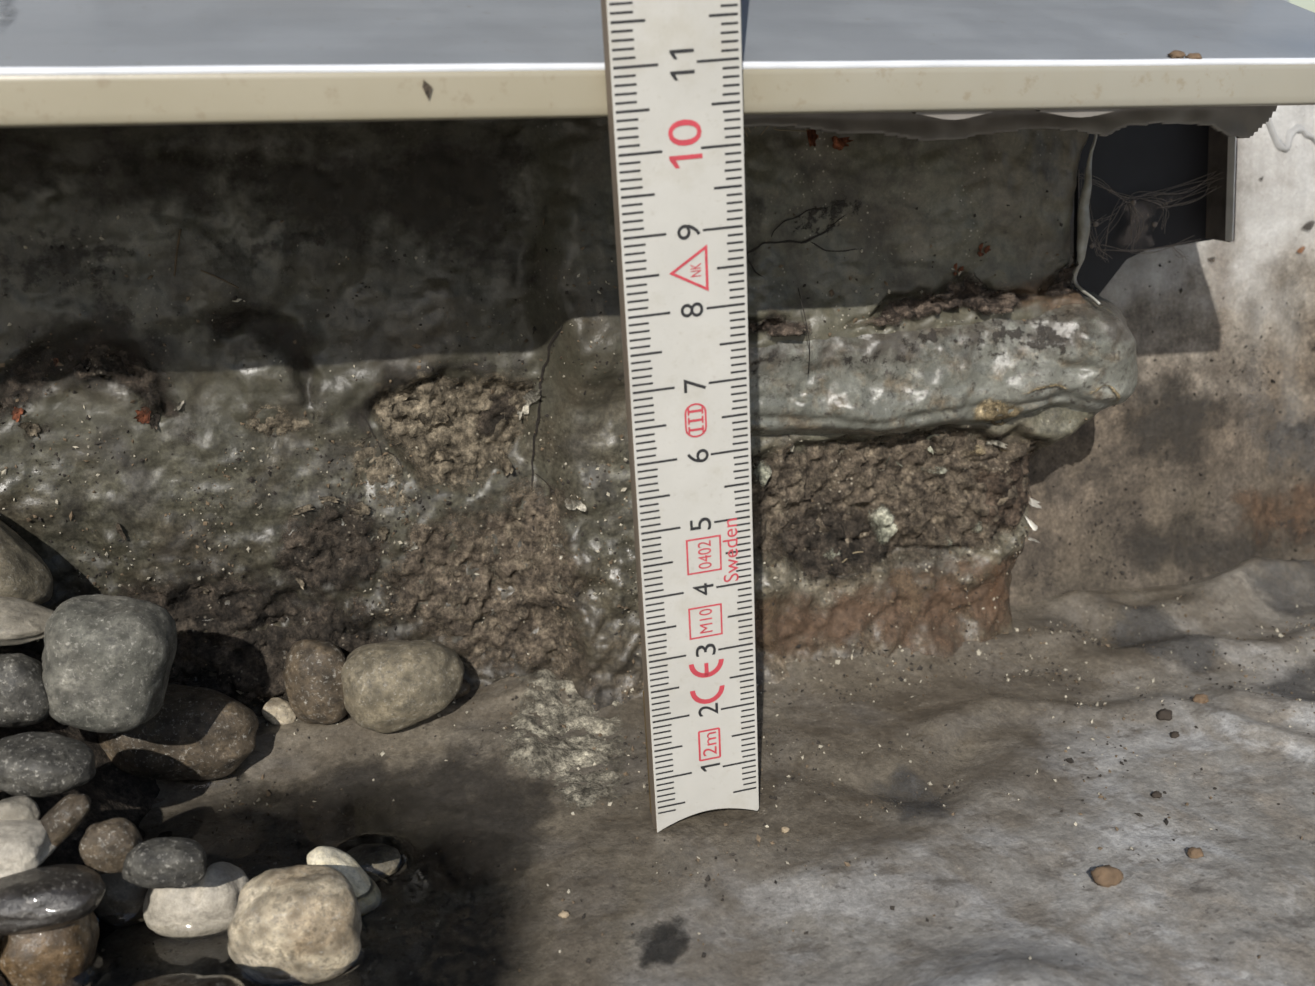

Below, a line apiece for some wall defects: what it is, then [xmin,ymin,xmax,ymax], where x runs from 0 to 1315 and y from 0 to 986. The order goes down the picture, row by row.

peeling [743,106,1277,141]
spalling [748,310,811,337]
spalling [866,257,1079,327]
water stain [1125,375,1226,459]
spalling [751,399,1046,581]
water stain [1126,514,1315,615]
water stain [270,749,550,897]